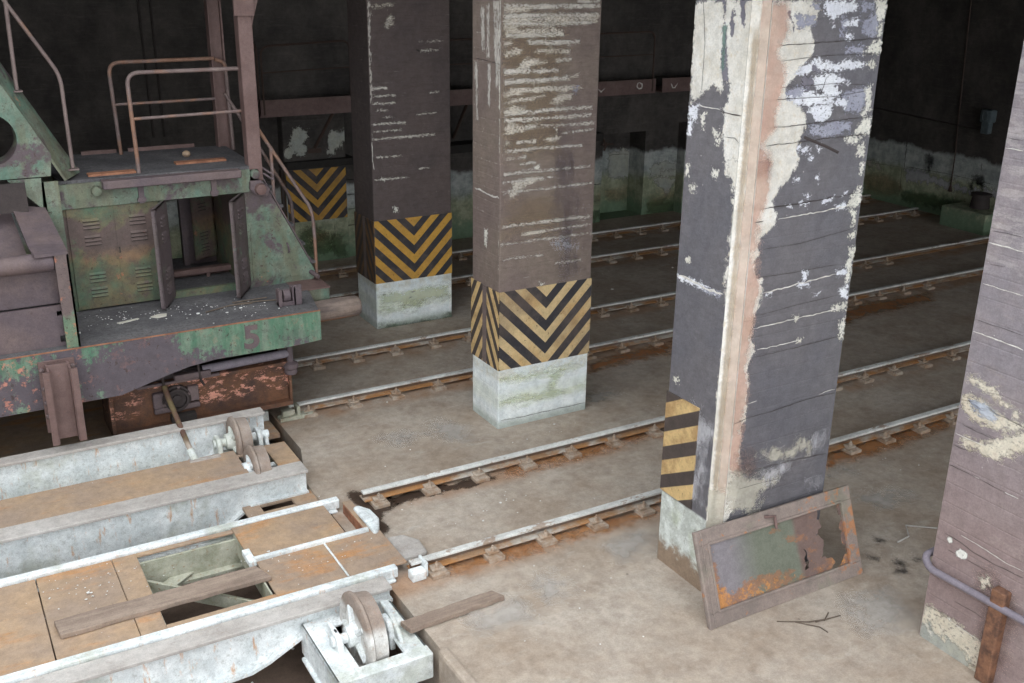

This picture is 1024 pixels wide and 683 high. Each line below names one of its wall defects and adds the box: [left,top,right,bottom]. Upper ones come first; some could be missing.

peeling [474,0,601,172]
corrosion [730,5,787,472]
peeling [677,0,888,523]
leakage [901,154,997,209]
peeling [959,374,1024,461]